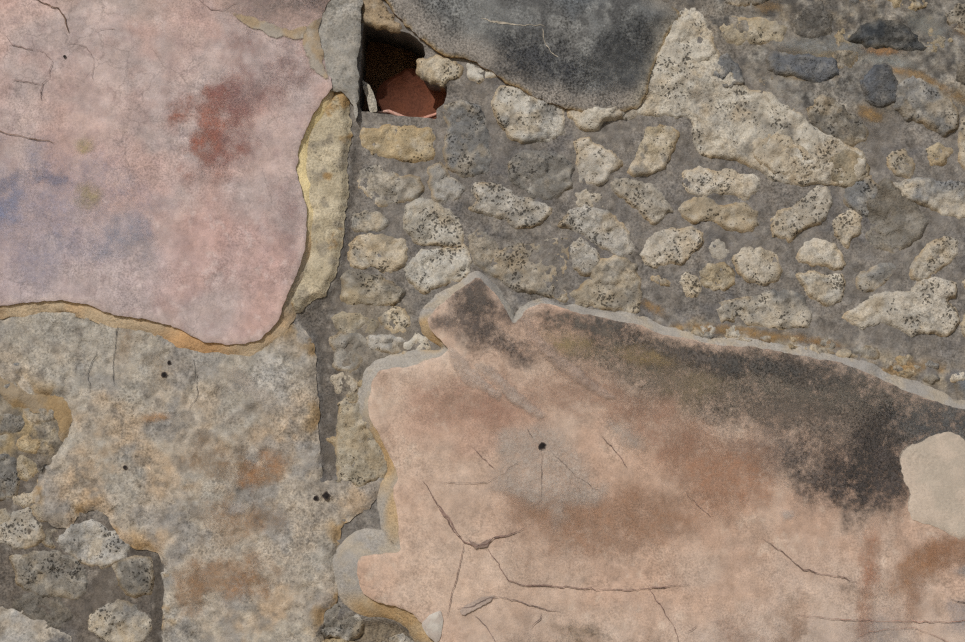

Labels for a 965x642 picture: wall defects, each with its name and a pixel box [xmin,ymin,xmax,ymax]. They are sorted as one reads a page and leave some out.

crack [8,39,52,98]
crack [38,0,115,84]
water stain [544,310,965,520]
crack [528,430,600,504]
crack [427,448,696,641]